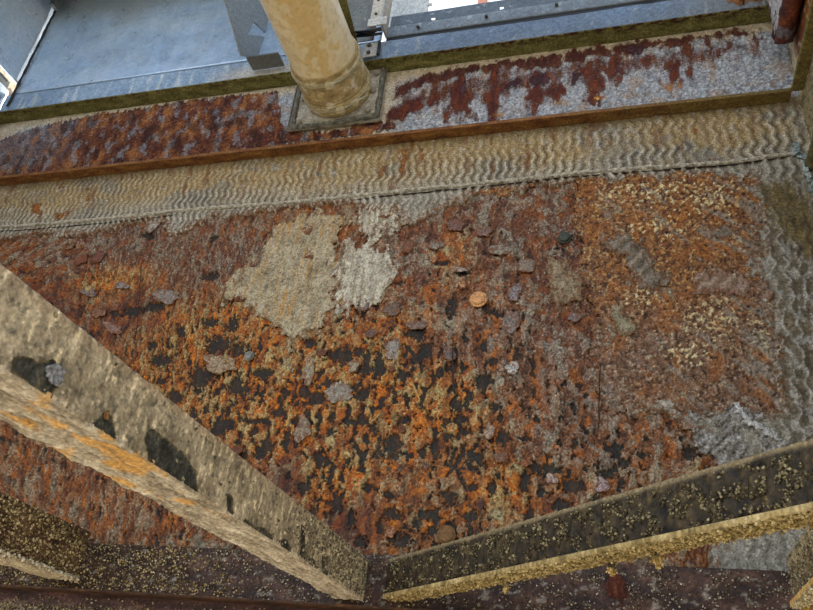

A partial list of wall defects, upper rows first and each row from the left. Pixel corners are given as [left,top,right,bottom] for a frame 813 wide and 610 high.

corrosion [0,27,768,176]
peeling [221,202,411,377]
corrosion [0,163,785,555]
corrosion [606,544,709,607]